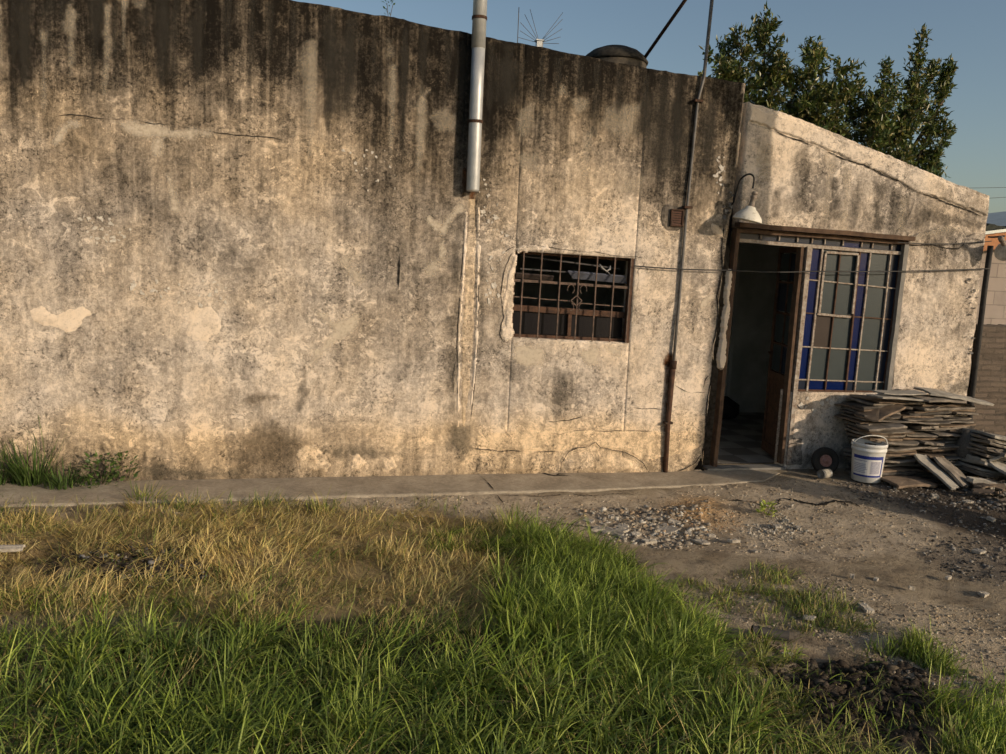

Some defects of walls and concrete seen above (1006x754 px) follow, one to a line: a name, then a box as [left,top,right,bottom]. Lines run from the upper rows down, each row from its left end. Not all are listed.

damp [123,122,208,155]
crack [54,108,286,141]
crack [752,124,981,249]
rust [664,353,673,432]
crack [472,407,657,514]